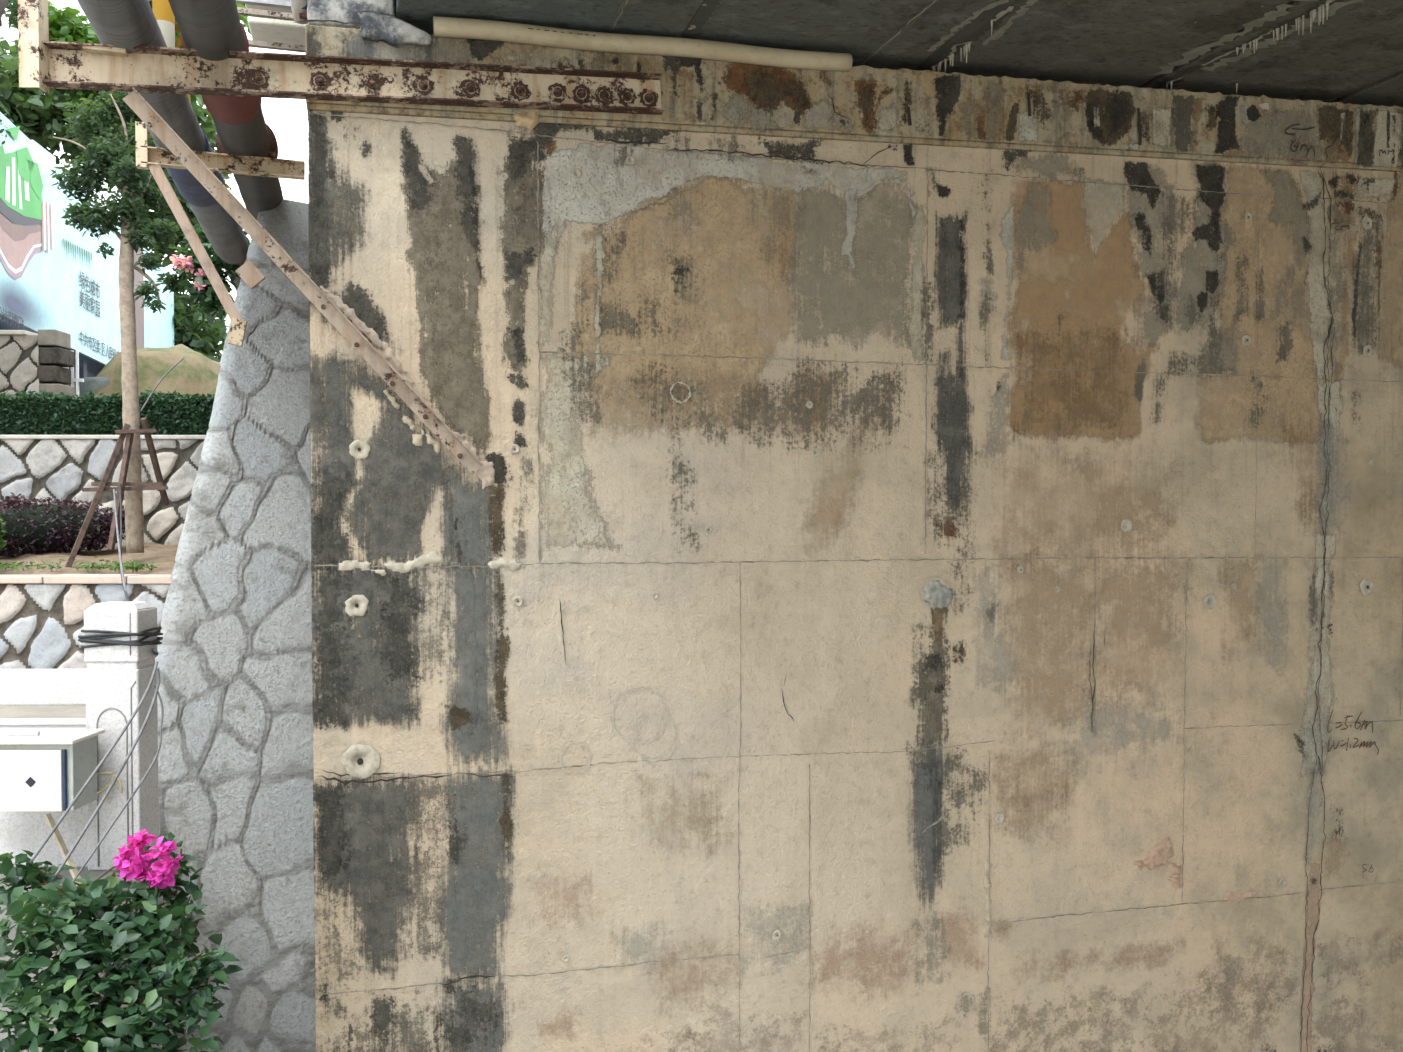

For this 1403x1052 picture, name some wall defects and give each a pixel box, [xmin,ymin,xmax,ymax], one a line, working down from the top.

corrosion [246,68,269,89]
leakage [307,25,322,55]
corrosion [548,83,659,107]
corrosion [707,62,929,135]
peeling [1268,169,1312,256]
peeling [536,142,916,551]
peeling [1133,299,1173,347]
leakage [308,29,704,1052]
leakage [558,0,1084,981]
leakage [1123,0,1403,1052]
crack [1300,135,1339,1051]
crack [1089,630,1105,736]